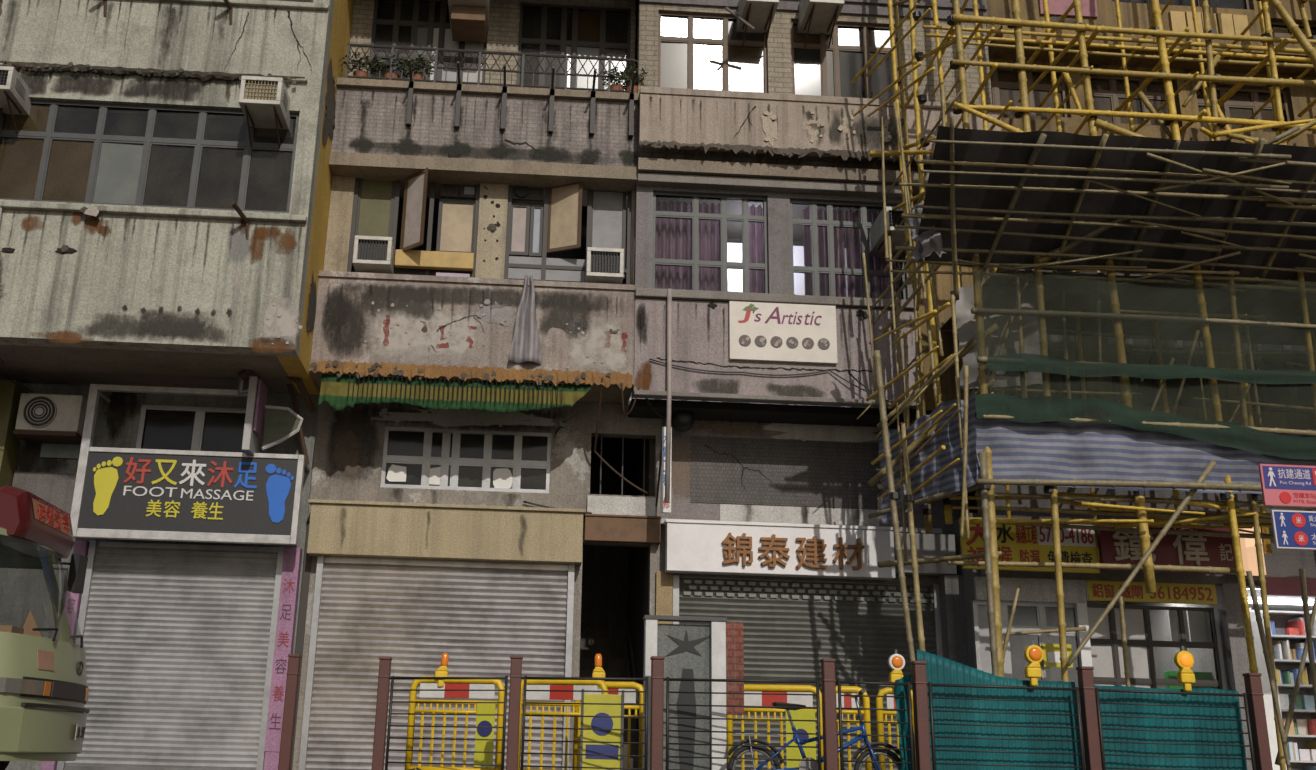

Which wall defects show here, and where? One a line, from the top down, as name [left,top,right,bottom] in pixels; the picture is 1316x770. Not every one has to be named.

damp [9,215,46,243]
rust [73,212,109,236]
rust [241,220,280,260]
damp [271,227,301,251]
damp [88,310,224,342]